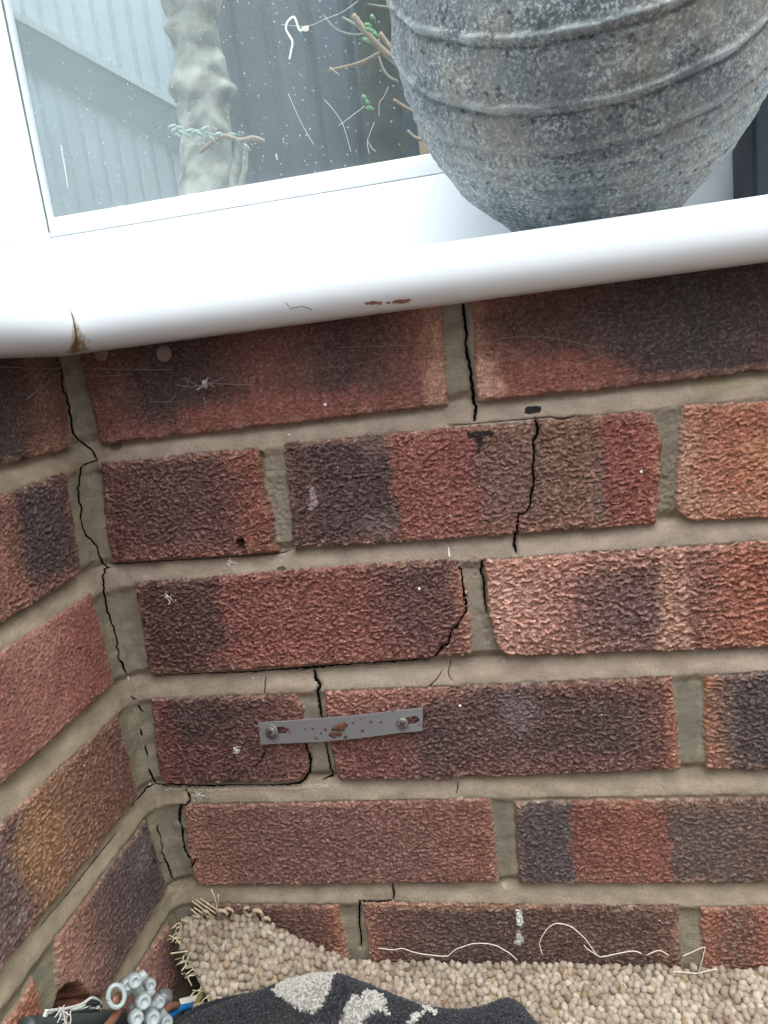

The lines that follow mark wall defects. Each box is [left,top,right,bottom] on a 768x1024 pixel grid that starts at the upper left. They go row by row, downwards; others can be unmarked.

crack [449,303,576,553]
crack [55,358,334,879]
crack [156,560,487,717]
rust [304,721,382,738]
crack [358,884,395,945]